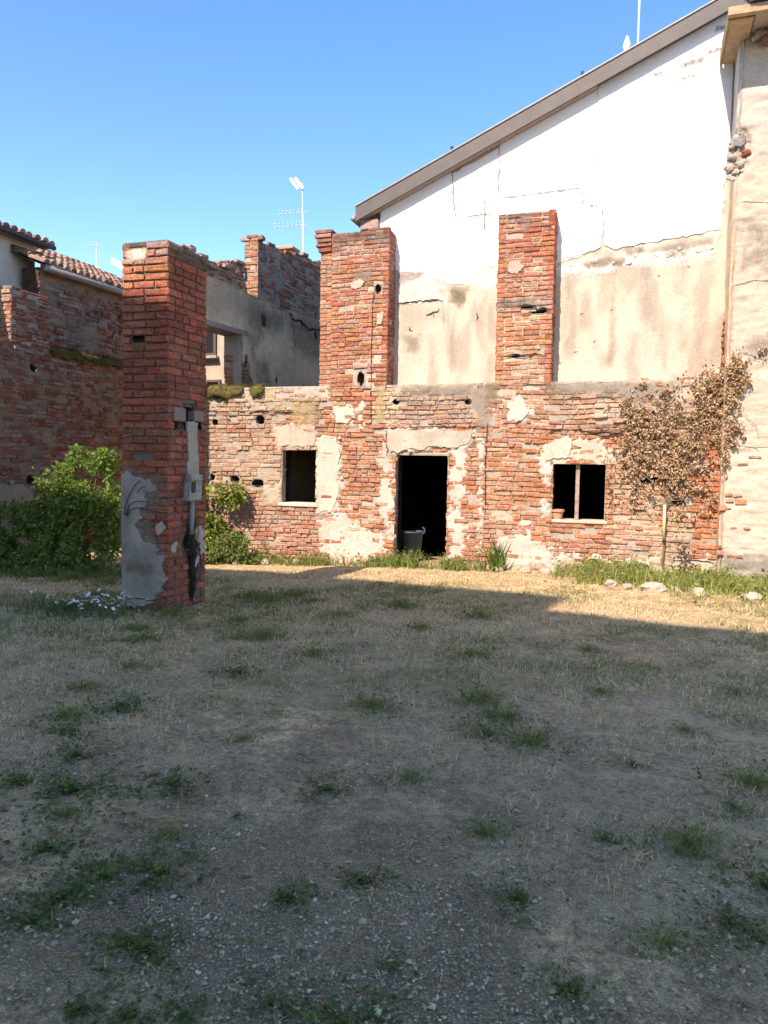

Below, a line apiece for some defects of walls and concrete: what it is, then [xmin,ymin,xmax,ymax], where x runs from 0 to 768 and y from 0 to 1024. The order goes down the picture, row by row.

spalling [723,129,752,181]
water stain [398,265,498,305]
water stain [556,240,715,278]
crack [276,312,320,386]
crack [370,285,489,534]
flaking render [507,397,529,421]
flaking render [255,415,343,515]
flaking render [543,439,581,461]
flaking render [121,471,168,607]